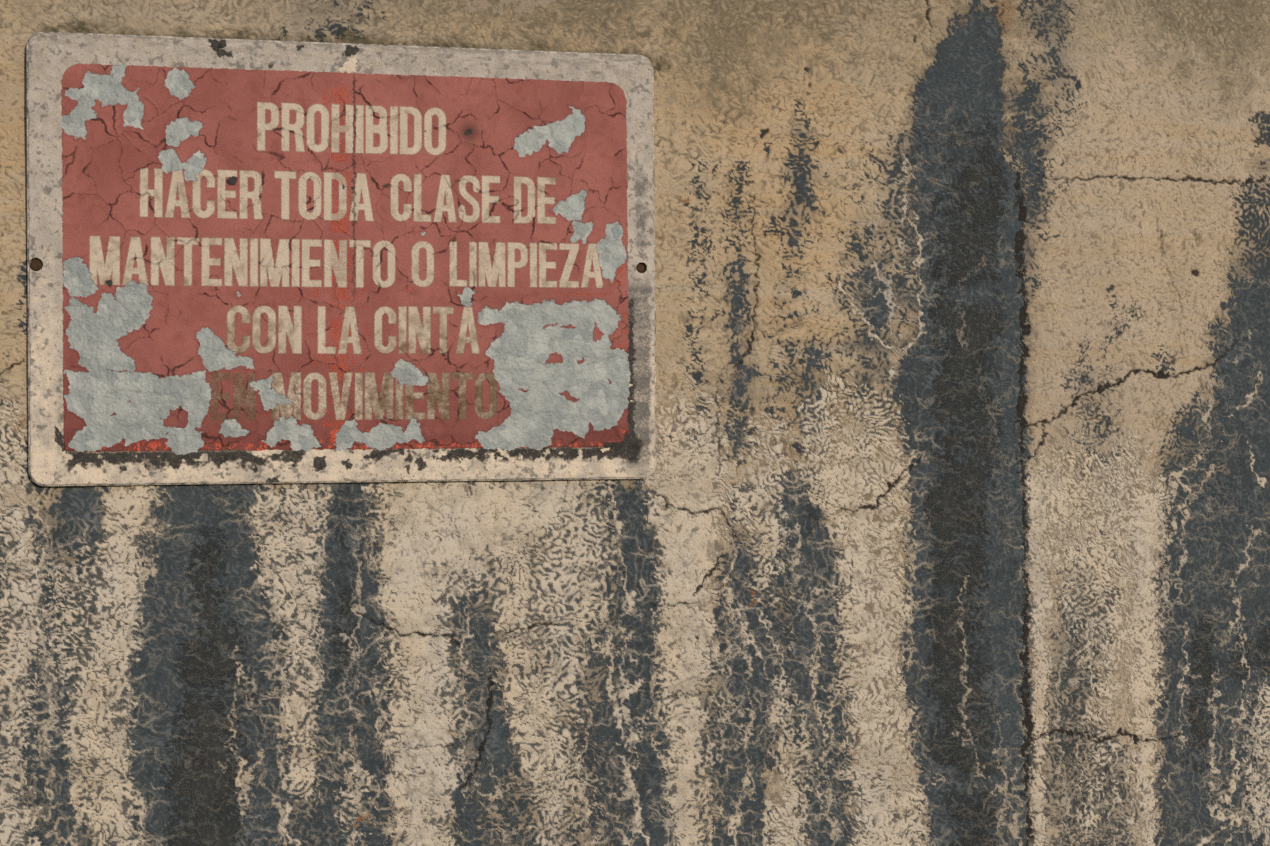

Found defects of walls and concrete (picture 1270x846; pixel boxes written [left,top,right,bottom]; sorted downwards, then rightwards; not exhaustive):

damp [1248,111,1270,147]
damp [684,156,717,300]
damp [763,98,829,330]
damp [16,261,28,335]
damp [683,309,710,390]
damp [755,406,785,420]
damp [1062,365,1116,400]
damp [1076,394,1113,445]
damp [1151,345,1175,374]
crack [1015,172,1261,845]